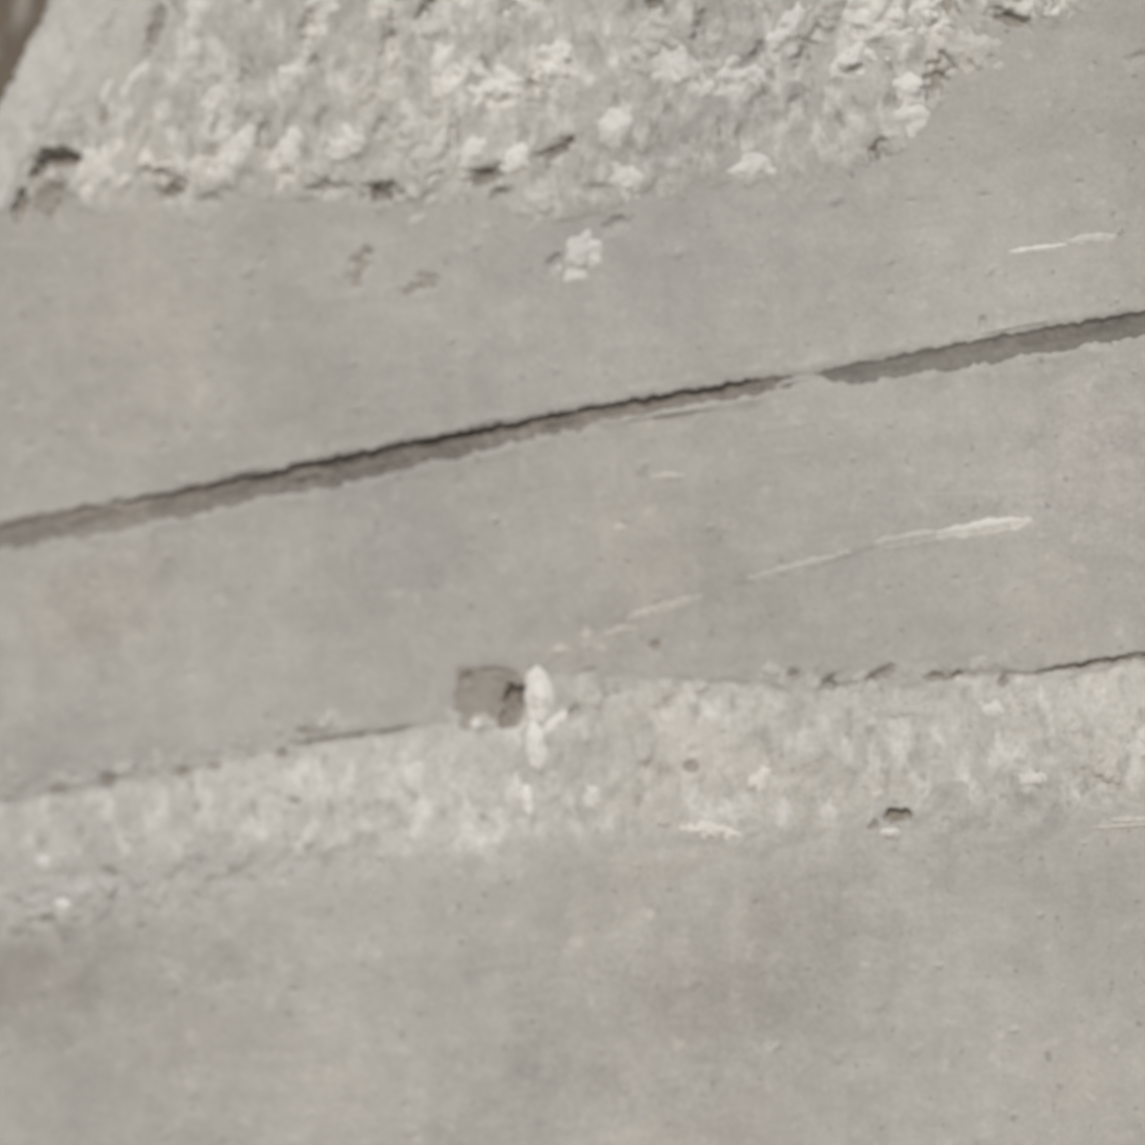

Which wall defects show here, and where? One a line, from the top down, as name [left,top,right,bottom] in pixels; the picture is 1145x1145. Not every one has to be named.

spalling [2,0,1103,289]
crack [0,310,1145,550]
crack [825,673,837,692]
crack [870,665,896,681]
crack [925,672,958,682]
crack [996,652,1145,687]
spalling [446,686,523,736]
crack [296,724,415,746]
spalling [748,766,771,791]
spalling [583,781,601,809]
spalling [653,814,741,840]
spalling [867,809,910,841]